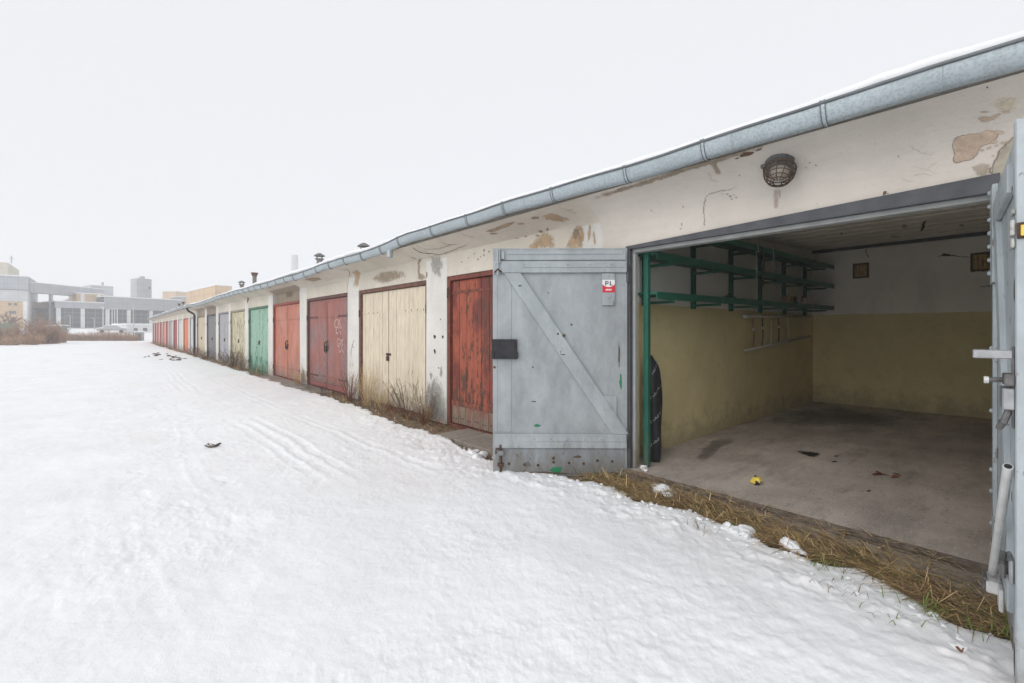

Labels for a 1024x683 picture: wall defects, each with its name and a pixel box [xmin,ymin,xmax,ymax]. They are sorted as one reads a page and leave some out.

peeling [952,111,1014,176]